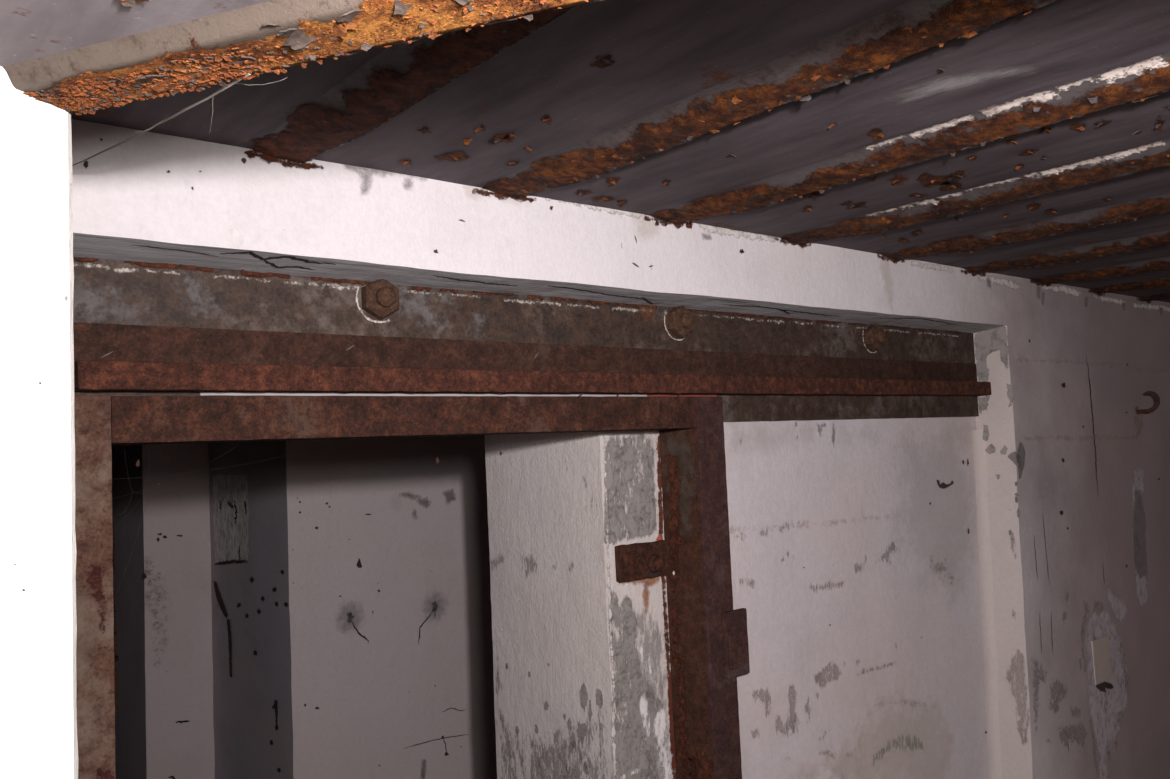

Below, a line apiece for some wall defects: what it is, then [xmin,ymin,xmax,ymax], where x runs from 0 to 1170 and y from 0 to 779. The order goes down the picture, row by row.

rust [35,0,595,170]
rust [434,0,1050,207]
rust [645,60,1170,264]
rust [124,261,214,273]
crack [138,245,336,270]
rust [311,276,371,285]
rust [473,291,657,309]
rust [961,231,1170,304]
peeling [974,326,1025,518]
spalling [500,433,668,779]
rust [630,576,676,779]
spalling [1096,681,1115,693]